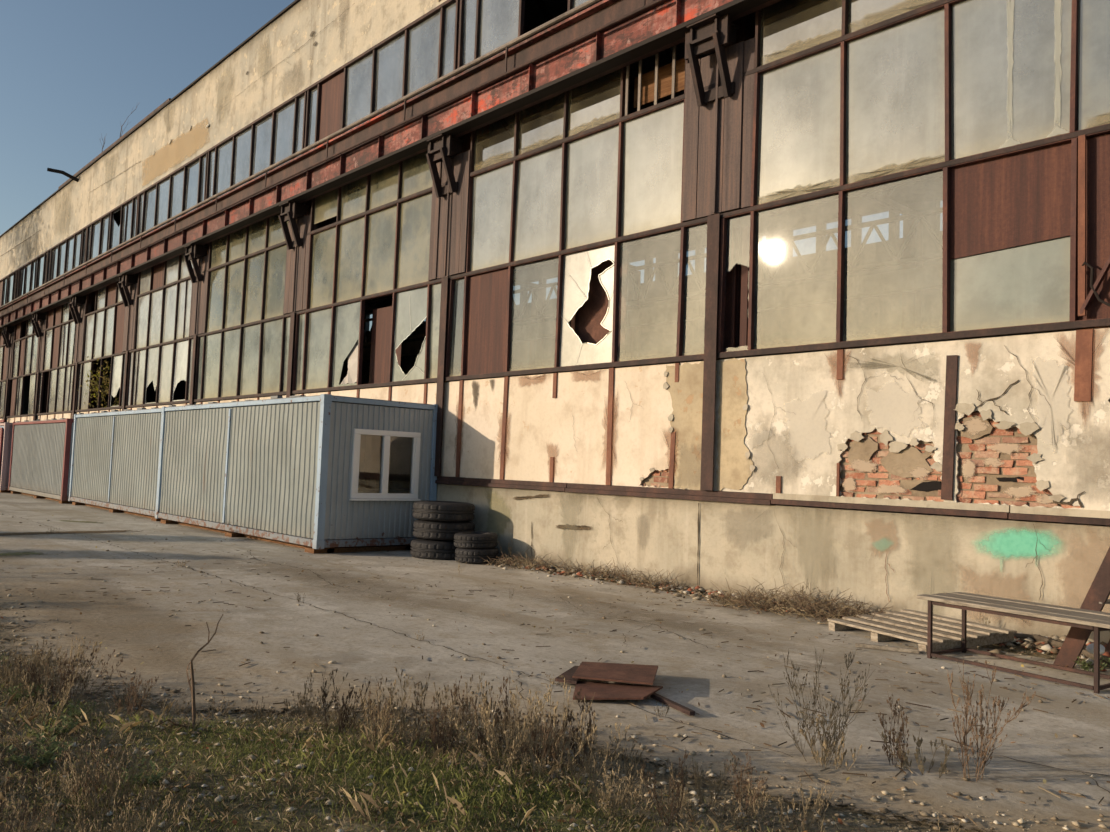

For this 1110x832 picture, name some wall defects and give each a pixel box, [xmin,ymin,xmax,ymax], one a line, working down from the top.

flaking render [143,120,209,186]
crack [846,355,934,420]
crack [975,345,1051,423]
flaking render [837,403,1081,508]
crack [14,515,572,700]